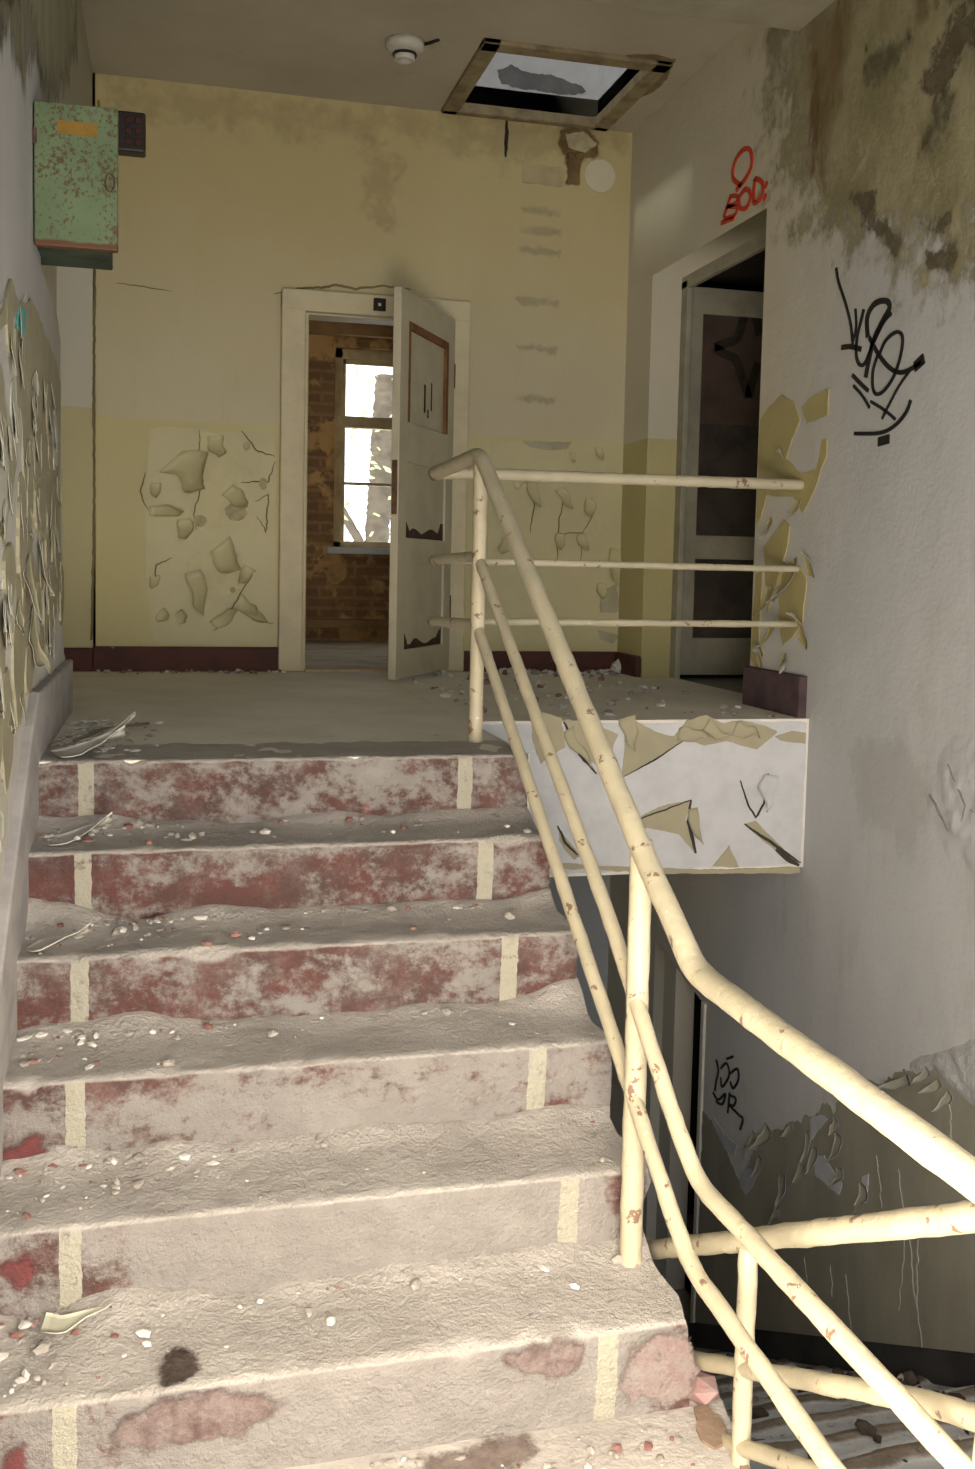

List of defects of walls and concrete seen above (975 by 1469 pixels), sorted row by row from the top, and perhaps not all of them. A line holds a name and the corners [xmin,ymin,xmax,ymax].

mould [0,0,78,102]
water stain [764,0,975,288]
peeling [0,276,65,894]
peeling [140,427,278,647]
peeling [750,389,830,674]
peeling [602,714,807,874]
peeling [698,1198,729,1234]
peeling [700,1101,969,1227]
peeling [868,1066,975,1156]
peeling [698,1253,738,1313]
peeling [755,1264,824,1337]
peeling [774,1233,975,1353]